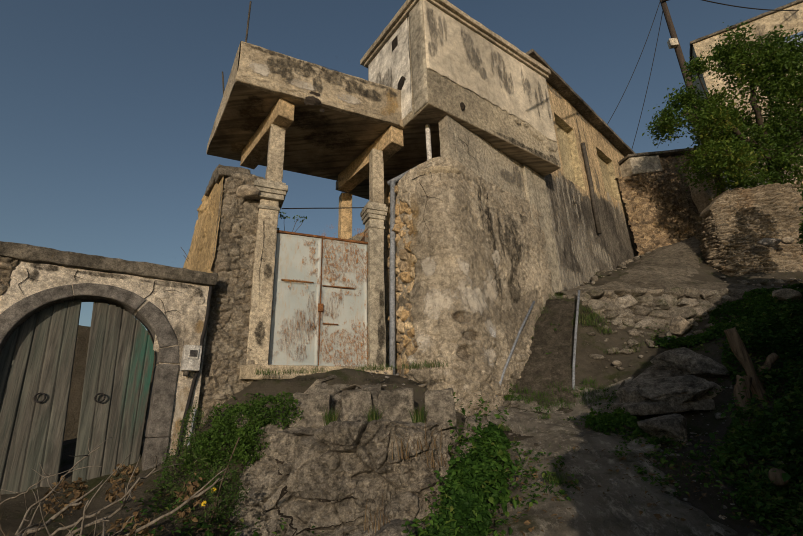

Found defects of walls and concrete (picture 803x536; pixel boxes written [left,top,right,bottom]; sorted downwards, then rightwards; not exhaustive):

leakage [427,9,446,55]
leakage [249,47,398,115]
leakage [463,34,561,119]
corrosion [275,227,369,366]
spalling [384,185,419,379]
leakage [424,185,523,338]
leakage [407,334,430,365]